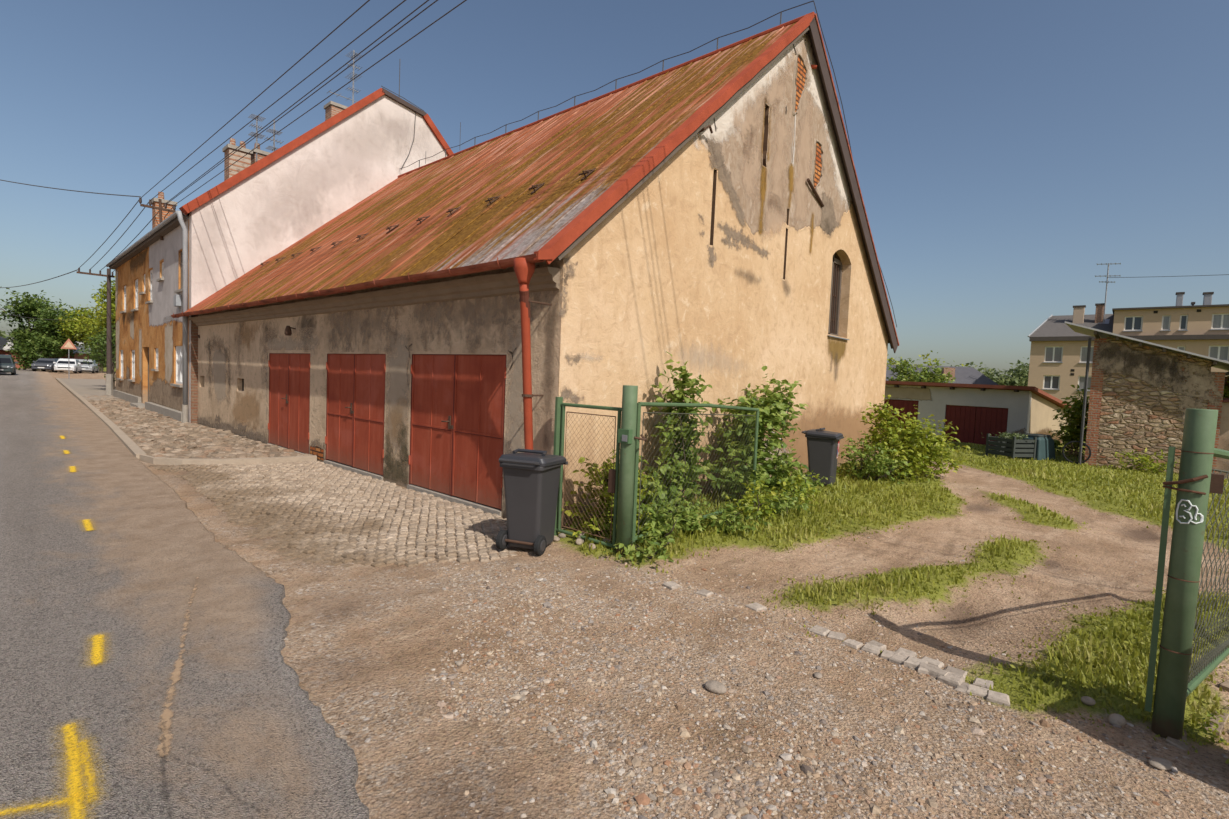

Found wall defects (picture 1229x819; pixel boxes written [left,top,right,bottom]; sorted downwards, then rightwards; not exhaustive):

rust [759,98,770,234]
peeling [695,32,852,268]
water stain [828,338,846,377]
water stain [383,428,408,484]